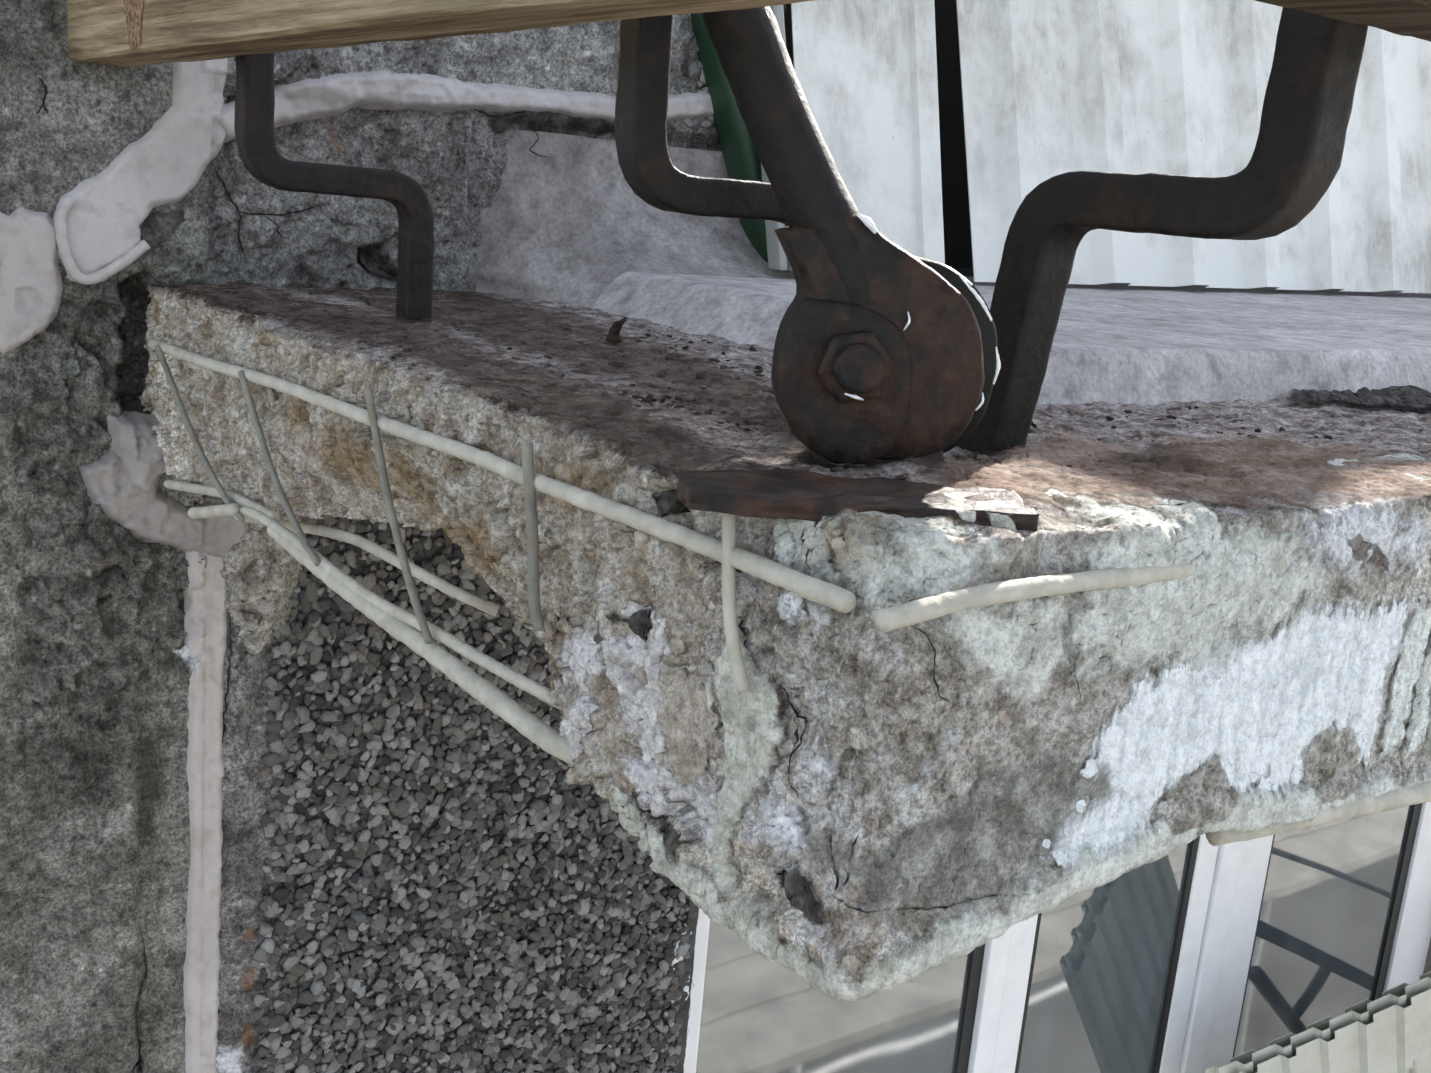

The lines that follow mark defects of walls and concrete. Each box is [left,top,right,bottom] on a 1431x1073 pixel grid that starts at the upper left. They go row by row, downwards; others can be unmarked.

crack [212,163,315,262]
corrosion [168,280,853,517]
corrosion [927,430,1431,509]
leakage [659,661,722,737]
crack [738,617,807,802]
spalling [167,291,1431,969]
crack [910,625,951,704]
crack [830,835,1042,914]
crack [136,933,147,1068]